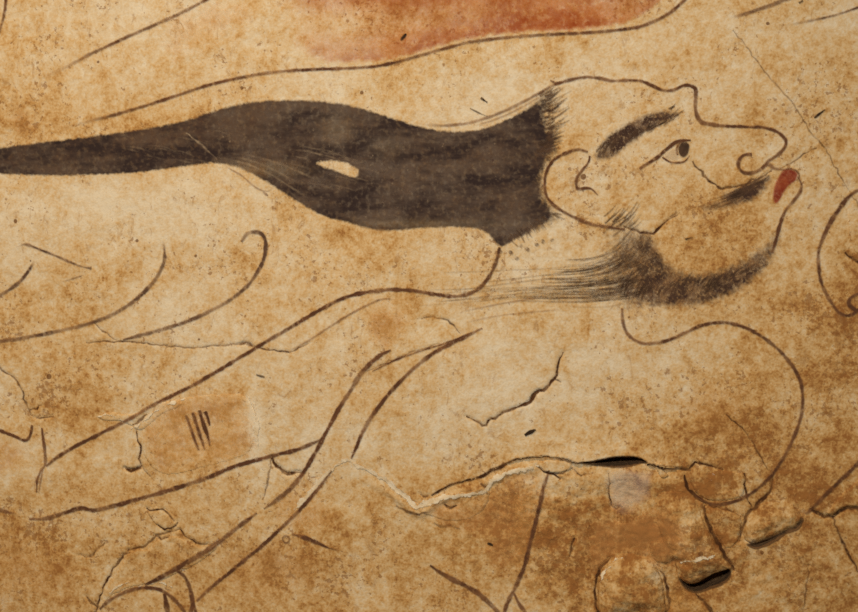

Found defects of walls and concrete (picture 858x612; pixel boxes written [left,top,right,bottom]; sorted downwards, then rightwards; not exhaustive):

crack [466,353,563,426]
crack [271,455,584,515]
crack [641,459,772,570]
crack [811,506,858,572]
crack [593,560,609,611]
crack [662,573,670,612]